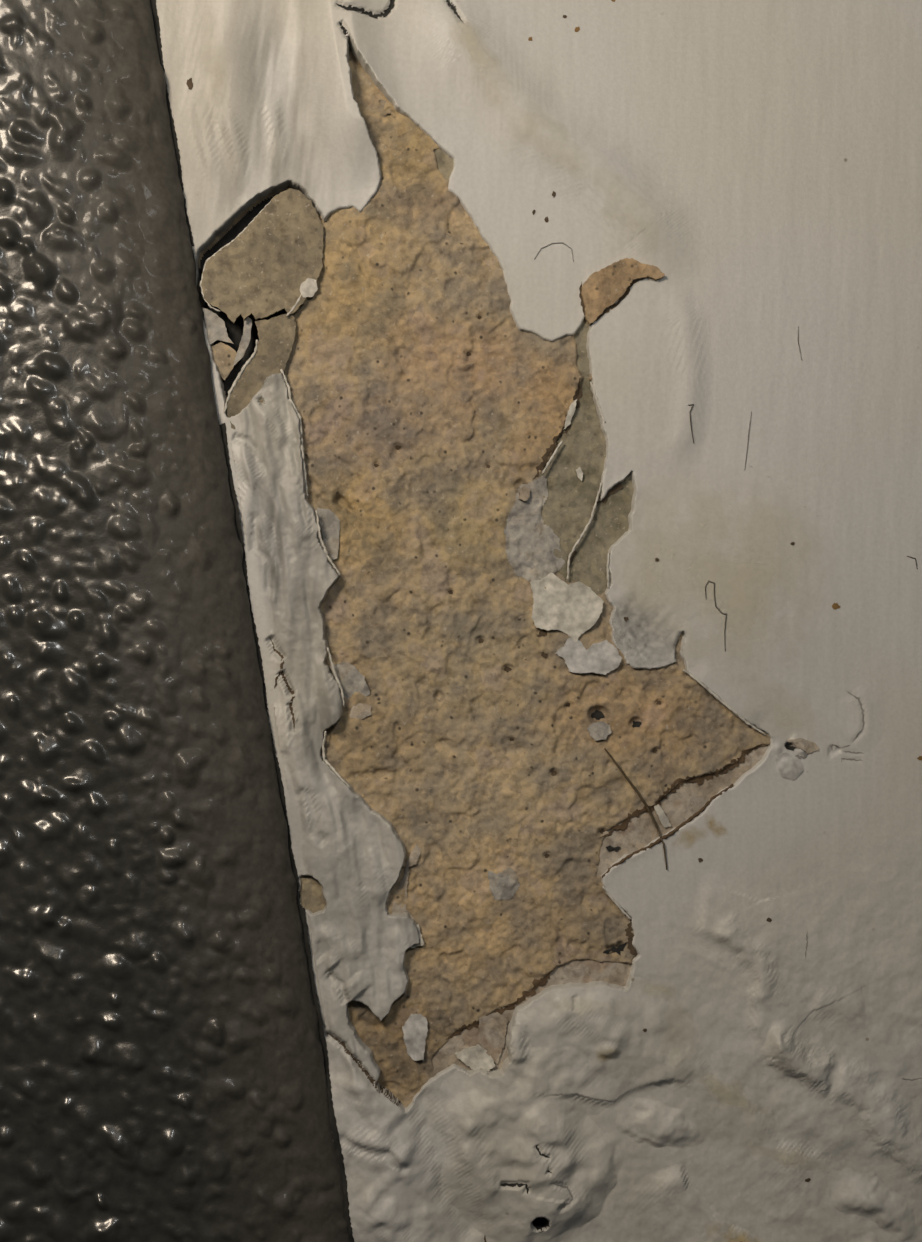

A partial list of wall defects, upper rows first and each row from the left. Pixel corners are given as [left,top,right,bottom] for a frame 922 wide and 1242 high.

crack [336,0,395,44]
crack [446,0,463,22]
peeling [198,47,819,1108]